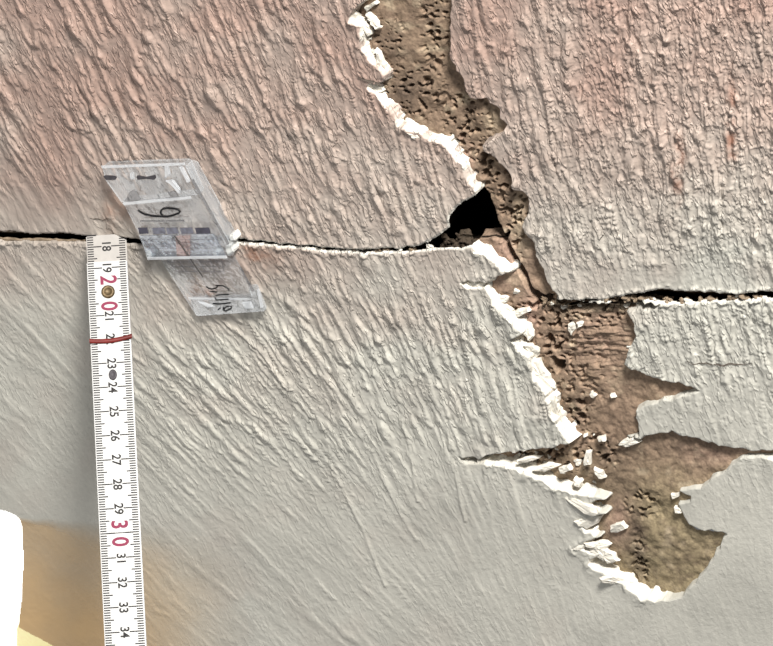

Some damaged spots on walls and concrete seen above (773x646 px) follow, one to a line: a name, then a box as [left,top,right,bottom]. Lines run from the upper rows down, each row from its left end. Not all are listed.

crack [0,218,107,242]
crack [127,235,437,254]
spalling [352,0,773,593]
crack [539,288,773,306]